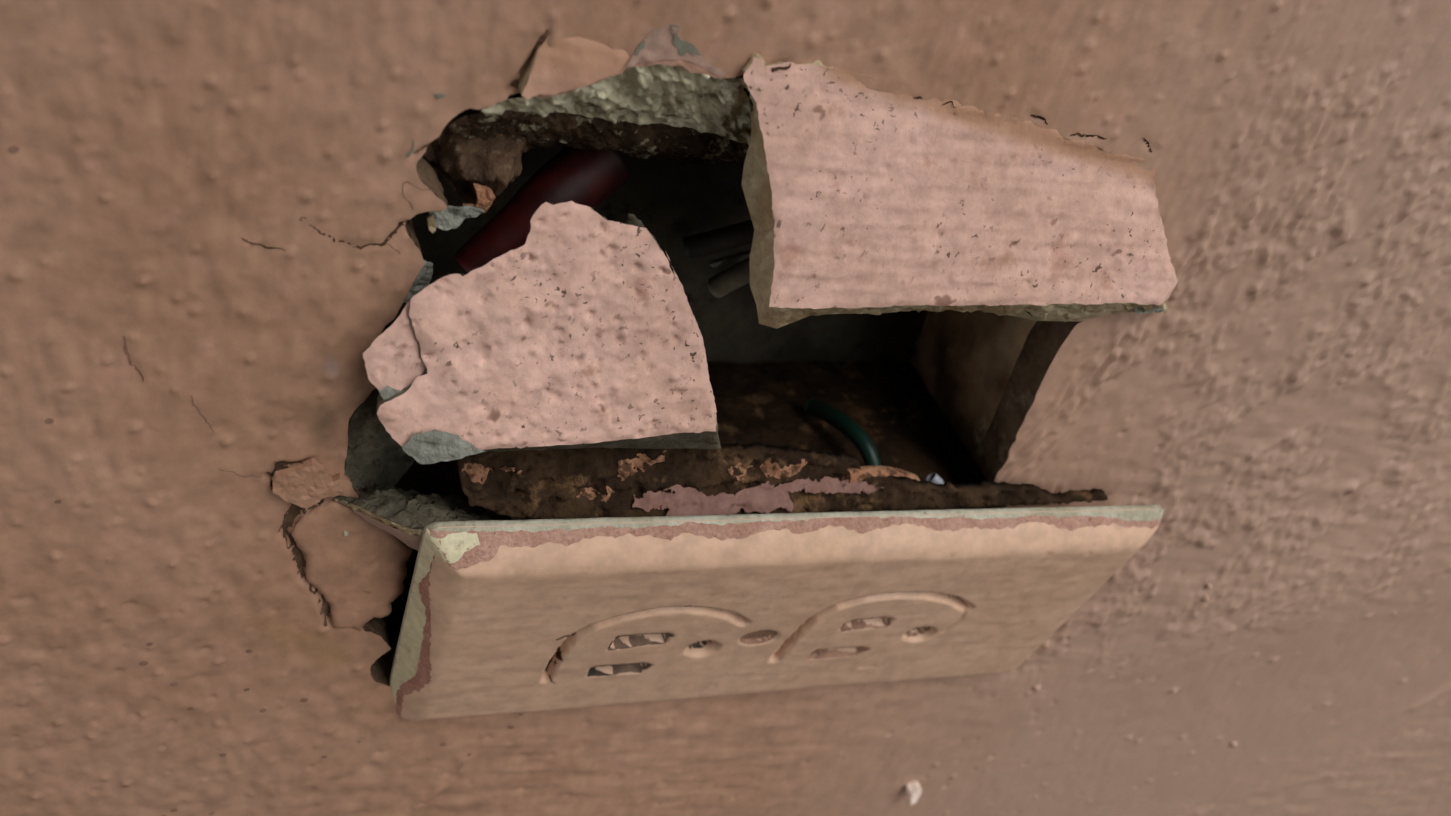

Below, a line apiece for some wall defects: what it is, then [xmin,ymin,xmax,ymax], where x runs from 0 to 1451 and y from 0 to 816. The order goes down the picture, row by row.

flaking render [481,24,753,145]
crack [241,145,433,253]
peeling [463,183,496,213]
flaking render [403,260,433,303]
flaking render [344,388,415,490]
corrosion [461,462,526,484]
corrosion [573,450,666,502]
peeling [632,476,884,516]
corrosion [728,457,821,483]